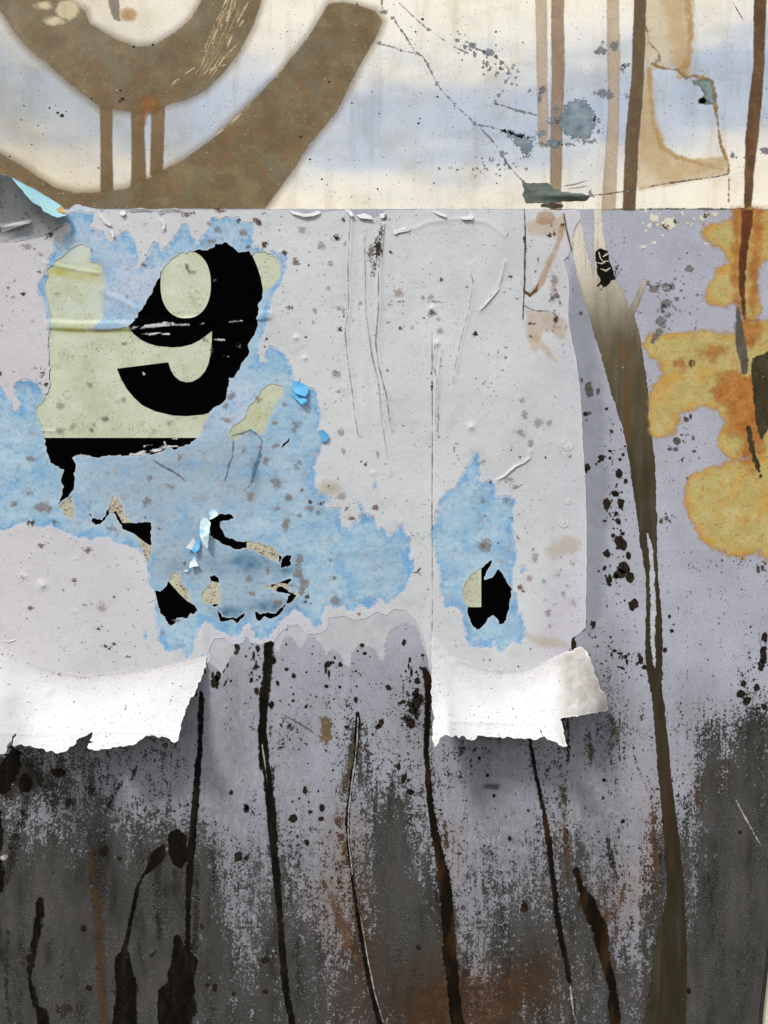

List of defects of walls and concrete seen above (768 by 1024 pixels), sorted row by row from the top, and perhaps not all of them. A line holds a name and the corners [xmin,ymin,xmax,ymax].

water stain [0,746,33,794]
water stain [26,897,49,1024]
water stain [112,691,204,1024]
water stain [258,641,295,1024]
peeling [276,646,343,719]
water stain [345,712,382,1024]
water stain [419,666,464,1024]
water stain [528,738,573,986]
water stain [549,292,603,623]
peeling [472,89,700,1024]
water stain [573,867,621,1024]
rust [643,207,768,562]